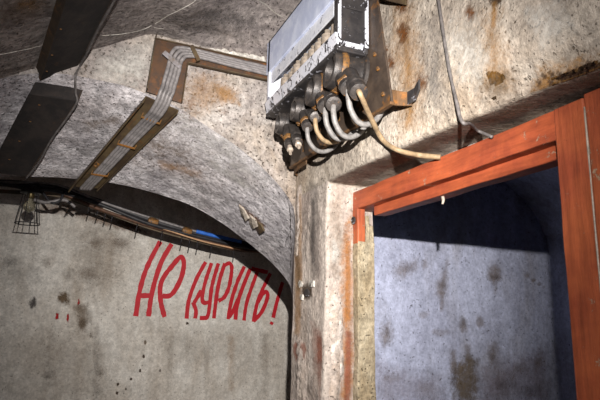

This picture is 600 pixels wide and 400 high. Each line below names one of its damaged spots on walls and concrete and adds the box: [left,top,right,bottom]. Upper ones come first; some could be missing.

rust [397,22,408,43]
rust [342,238,352,400]
damp [454,359,476,400]